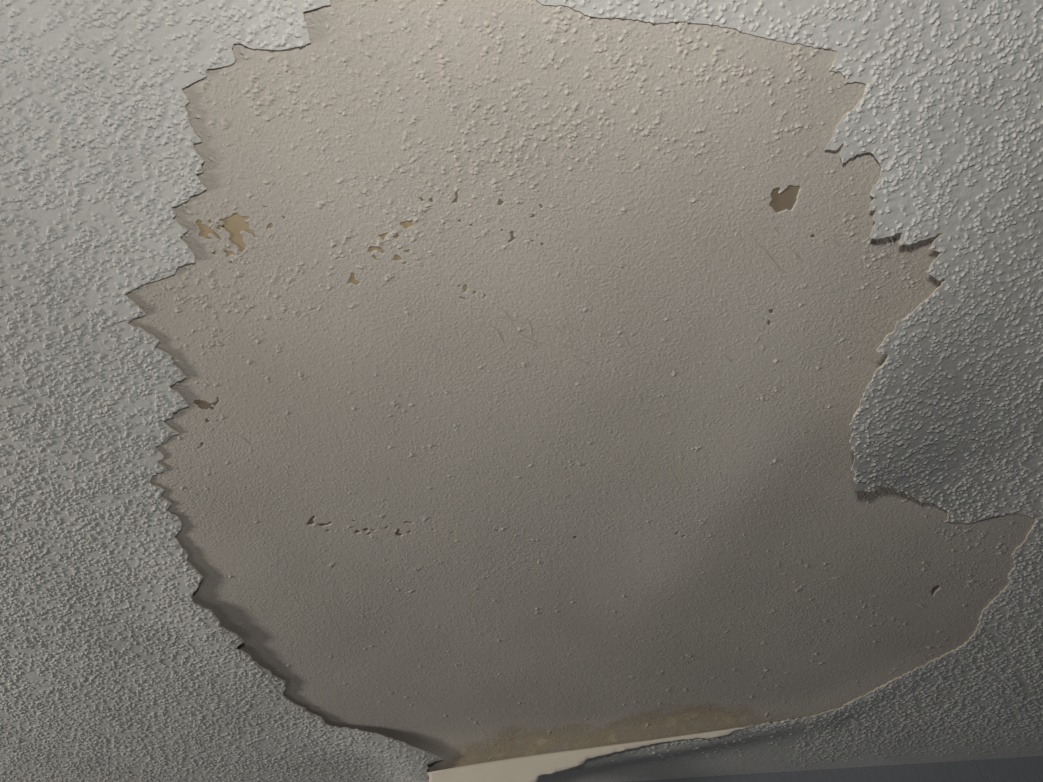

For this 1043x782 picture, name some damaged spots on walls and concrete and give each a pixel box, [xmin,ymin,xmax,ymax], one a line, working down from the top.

spalling [770,185,801,212]
spalling [196,220,222,240]
spalling [217,213,257,252]
spalling [193,400,215,410]
peeling [748,634,974,726]
peeling [303,708,752,782]
water stain [454,708,753,766]